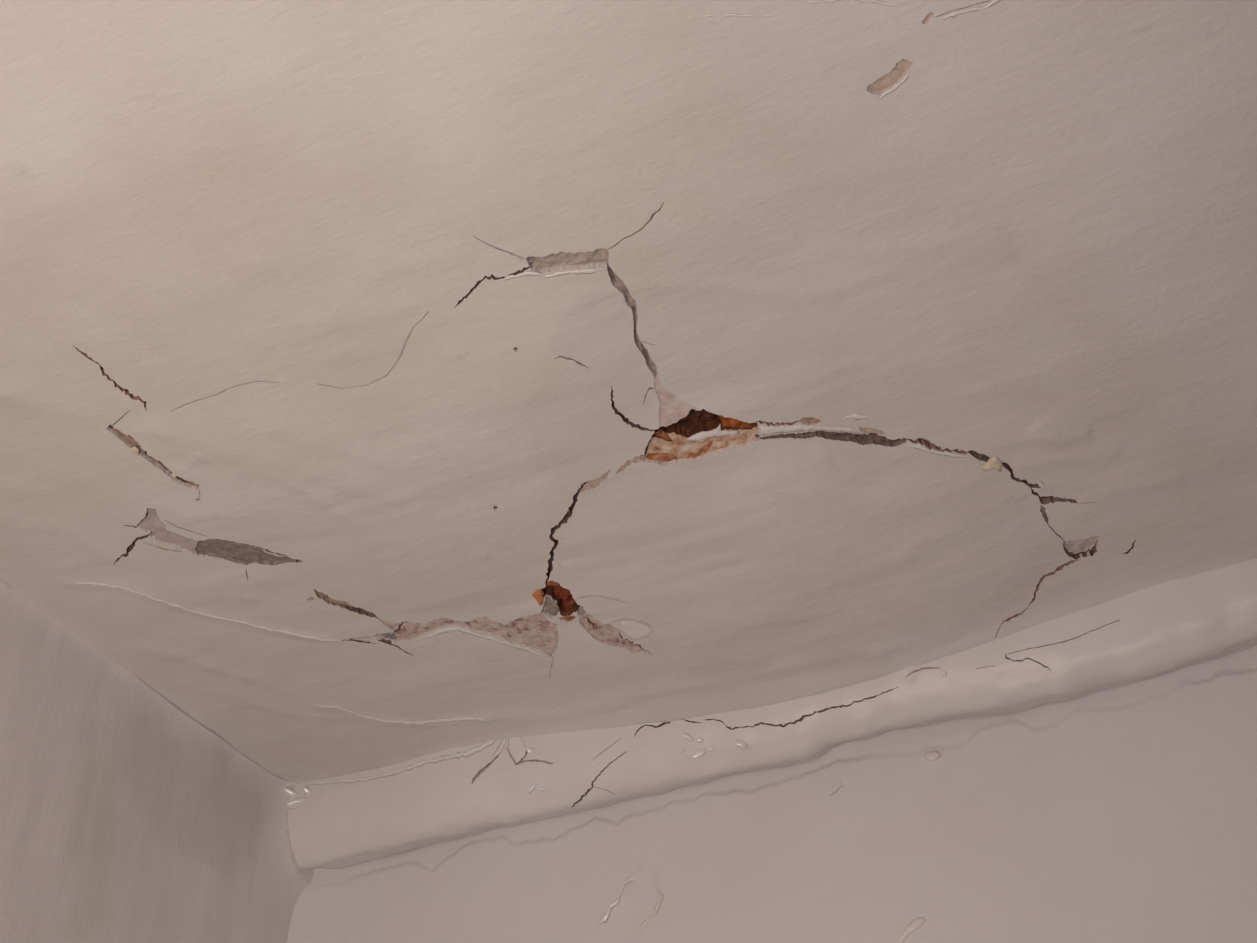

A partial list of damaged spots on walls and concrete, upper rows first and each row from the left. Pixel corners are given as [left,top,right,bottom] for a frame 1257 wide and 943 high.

crack [922,0,1001,24]
flaking render [867,59,914,100]
crack [73,346,278,502]
crack [316,202,664,583]
flaking render [639,376,760,466]
flaking render [114,508,303,579]
crack [754,413,1120,671]
crack [307,589,378,619]
peeling [342,574,654,678]
crack [572,667,941,807]